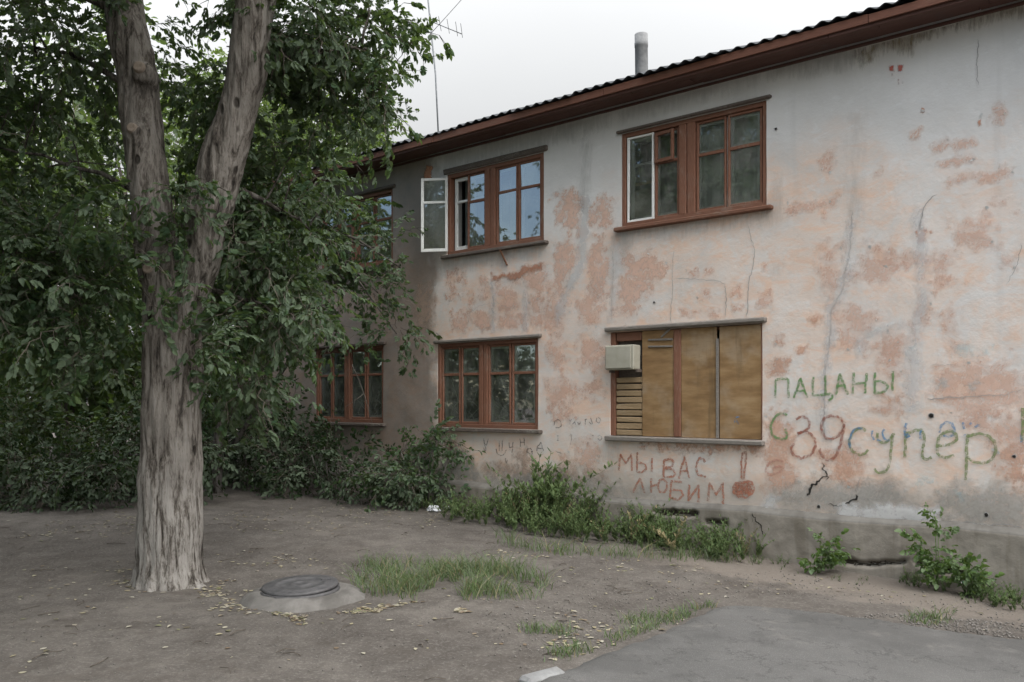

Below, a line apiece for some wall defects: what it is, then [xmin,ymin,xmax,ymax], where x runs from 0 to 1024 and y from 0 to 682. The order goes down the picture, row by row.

peeling [548,189,667,314]
crack [670,229,755,321]
crack [806,463,865,507]